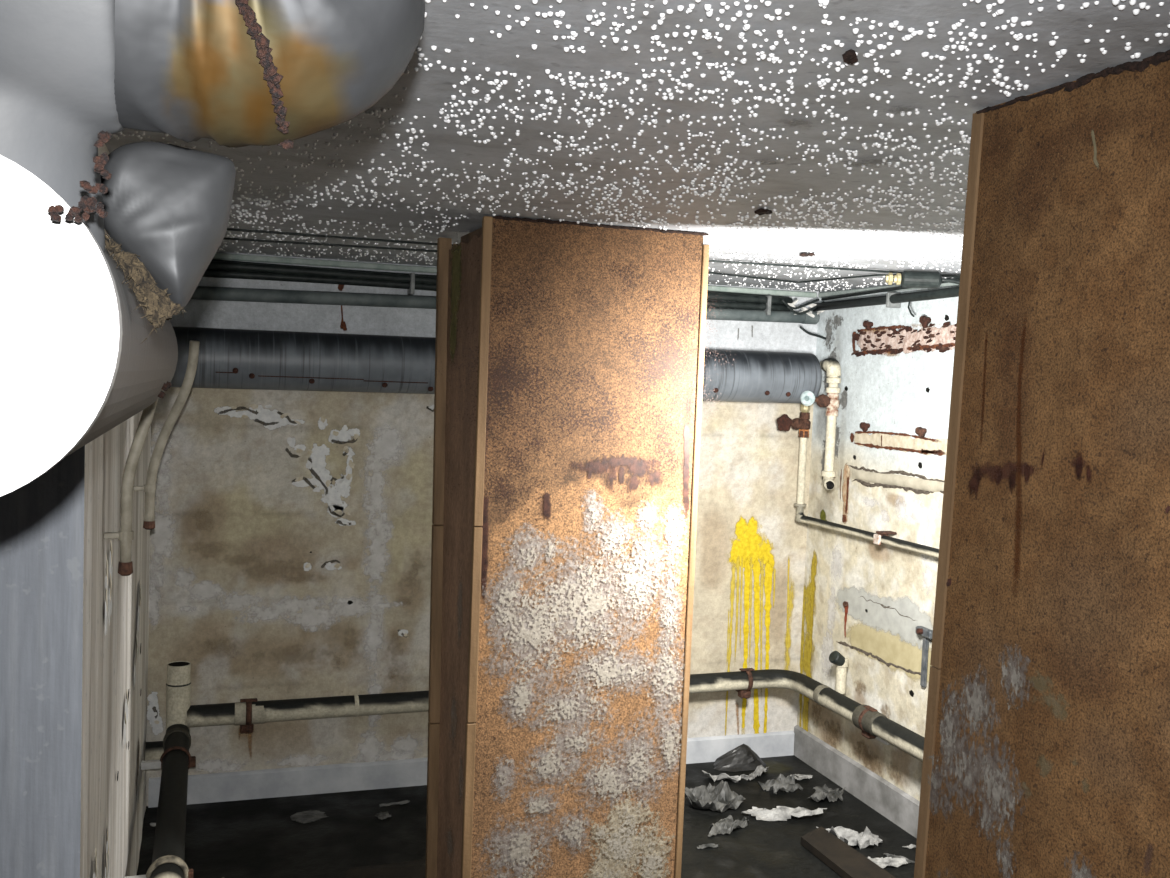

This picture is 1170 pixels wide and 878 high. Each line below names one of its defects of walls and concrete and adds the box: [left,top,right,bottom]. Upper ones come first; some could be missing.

leakage [149,425,402,663]
peeling [214,404,360,526]
leakage [434,237,734,878]
corrosion [1015,328,1025,576]
leakage [928,671,1018,875]
leakage [1001,658,1023,710]